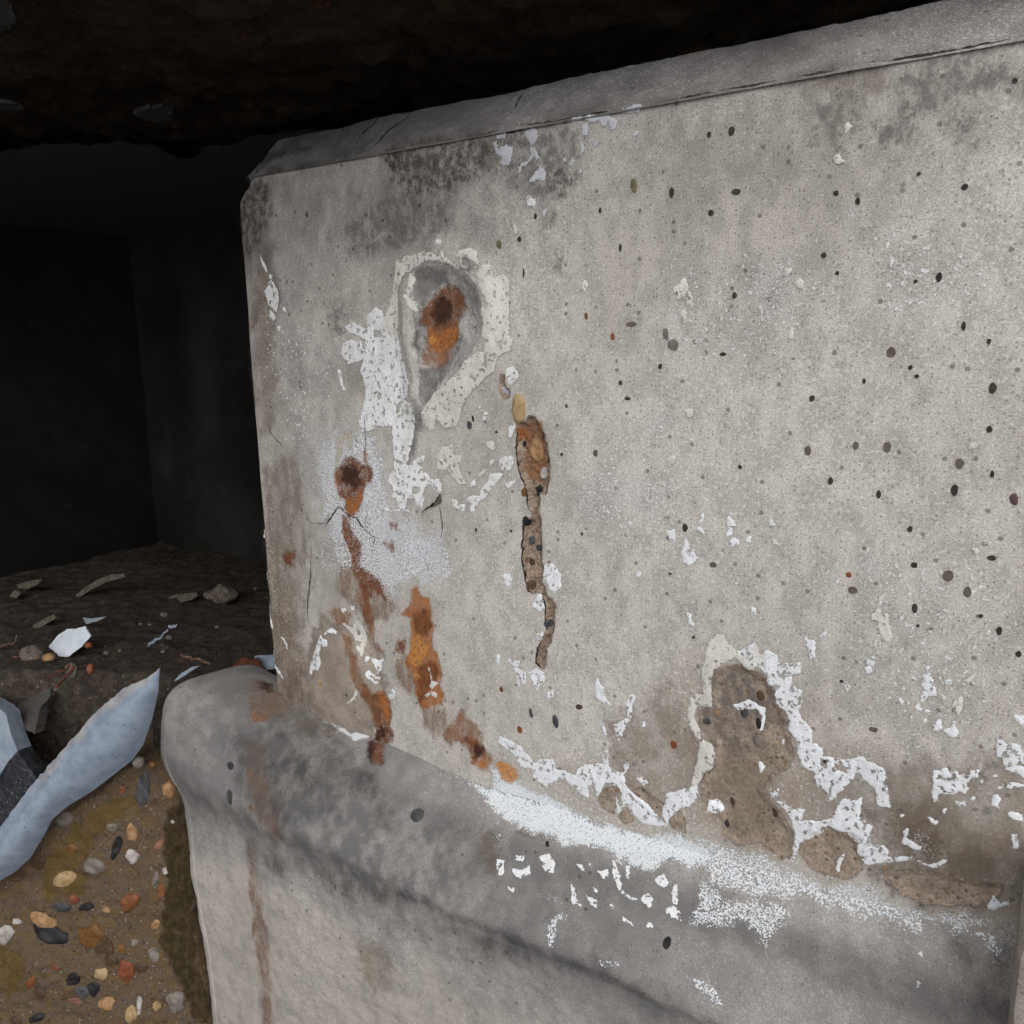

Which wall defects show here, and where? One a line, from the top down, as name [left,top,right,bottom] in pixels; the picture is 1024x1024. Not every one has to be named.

damp [352,135,522,249]
rust [419,286,467,369]
peeling [337,239,563,702]
crack [307,506,375,624]
rust [332,431,394,765]
damp [323,720,369,741]
rust [396,588,518,782]
peeling [496,629,1009,910]
peeling [928,739,1024,849]
peeling [641,874,682,921]
damp [434,767,1002,956]
efflorescence [687,976,722,1005]